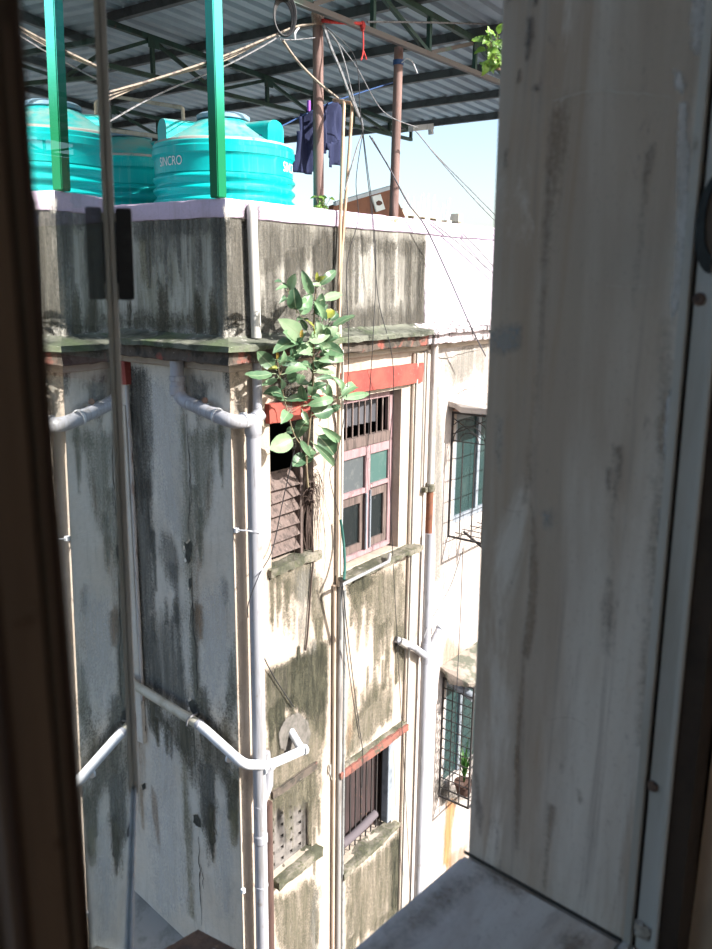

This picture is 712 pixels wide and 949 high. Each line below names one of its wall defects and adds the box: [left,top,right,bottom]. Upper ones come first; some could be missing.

leakage [133,205,426,337]
leakage [129,367,226,913]
leakage [270,572,323,672]
leakage [269,696,309,754]
leakage [226,773,239,840]
leakage [272,765,321,847]
corrosion [443,800,465,869]
crack [198,828,217,924]
leakage [311,892,319,949]
leakage [346,927,363,949]